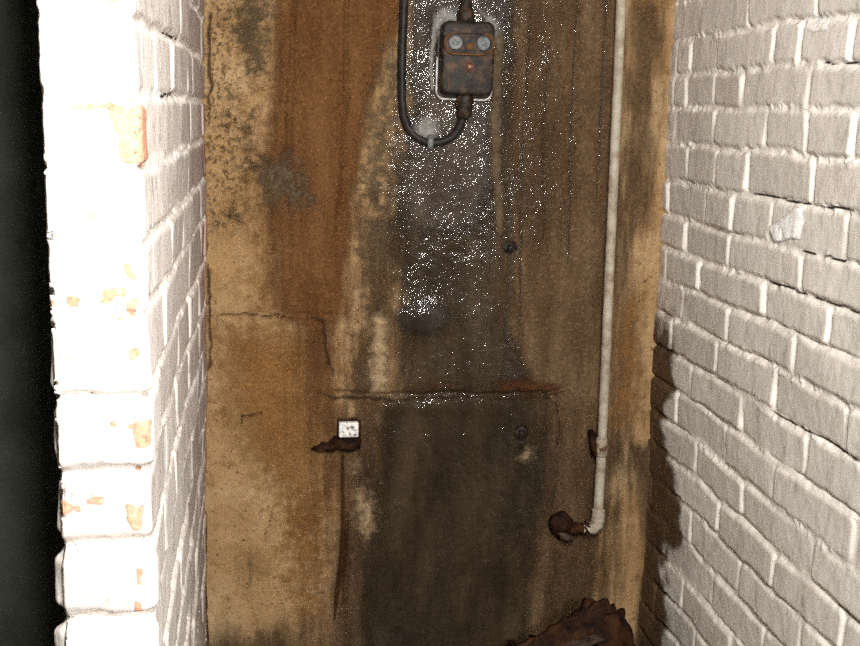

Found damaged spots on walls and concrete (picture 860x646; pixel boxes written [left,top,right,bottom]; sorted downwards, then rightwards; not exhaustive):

peeling [73,98,148,167]
crack [207,13,215,125]
mould [205,0,270,193]
corrosion [218,0,400,620]
crack [206,243,561,447]
water stain [329,0,663,646]
crack [754,193,854,211]
crack [770,280,860,313]
crack [803,250,847,262]
peeling [128,419,152,448]
water stain [634,323,683,646]
water stain [205,569,312,646]